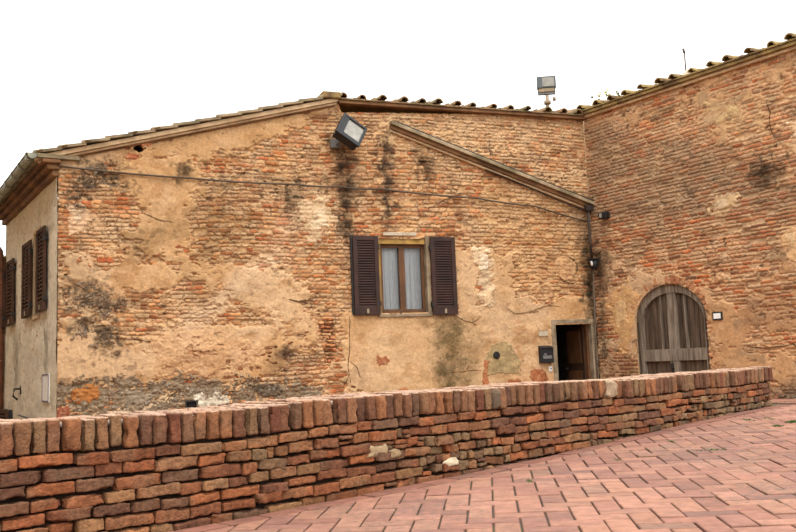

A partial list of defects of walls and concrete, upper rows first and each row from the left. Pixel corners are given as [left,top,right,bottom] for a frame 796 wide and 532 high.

peeling [65,143,152,235]
peeling [291,188,340,248]
damp [372,130,398,220]
crack [508,302,560,314]
spalling [57,367,325,418]
crack [343,316,360,387]
spalling [508,368,548,383]